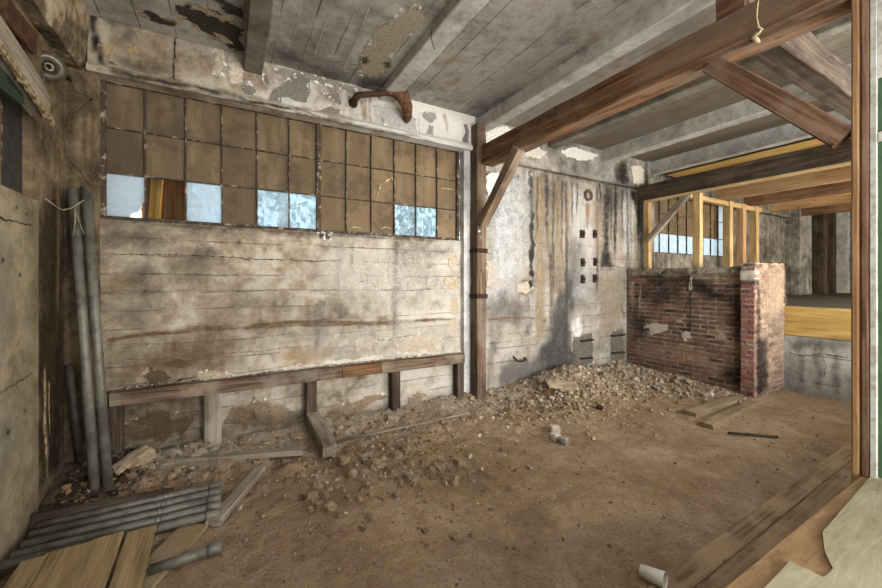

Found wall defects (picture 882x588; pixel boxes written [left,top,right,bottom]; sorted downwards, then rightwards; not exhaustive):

crack [169,37,177,80]
spalling [136,0,426,115]
peeling [561,147,598,161]
peeling [631,165,644,185]
peeling [486,256,505,290]
peeling [517,281,534,294]
leakage [491,171,582,384]
leakage [597,184,641,329]